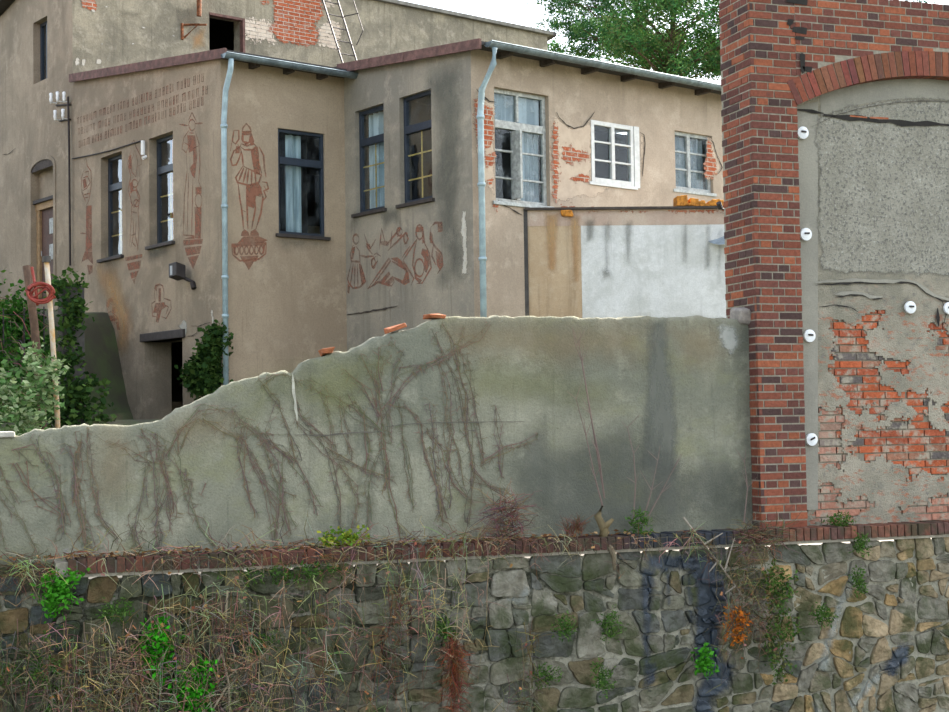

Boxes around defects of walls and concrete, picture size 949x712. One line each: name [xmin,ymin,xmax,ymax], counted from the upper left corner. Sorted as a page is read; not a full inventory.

flaking render [81,0,107,12]
flaking render [260,0,344,51]
crack [797,100,949,127]
flaking render [472,99,499,212]
flaking render [550,119,609,213]
flaking render [703,137,720,180]
crack [816,278,949,327]
spalling [818,310,949,482]
spalling [807,482,875,524]
spalling [908,493,949,521]
leakage [640,554,734,712]